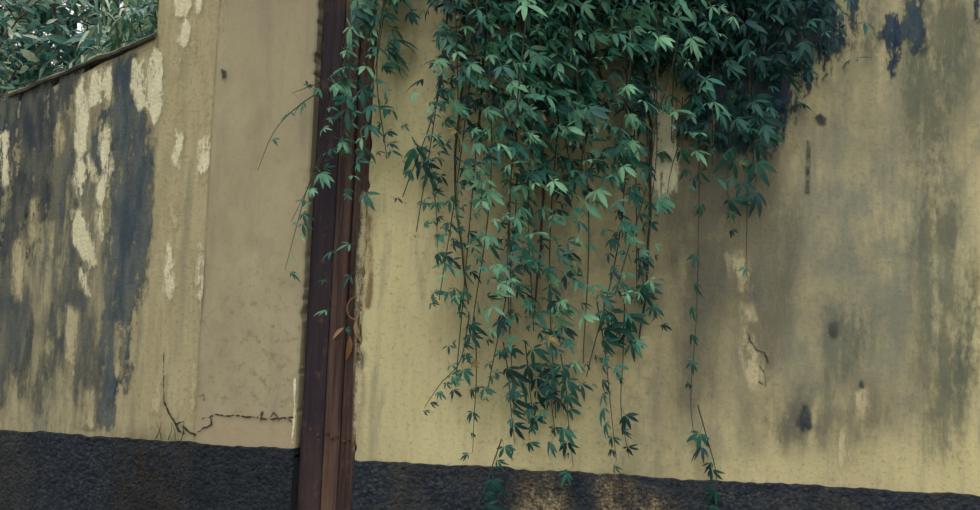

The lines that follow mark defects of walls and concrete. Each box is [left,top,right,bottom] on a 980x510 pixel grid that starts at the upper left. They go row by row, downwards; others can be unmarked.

peeling [0,130,10,188]
peeling [12,198,54,301]
leakage [0,53,155,431]
peeling [55,67,114,297]
peeling [130,48,164,125]
peeling [174,0,203,48]
peeling [643,69,681,201]
leakage [667,0,859,407]
leakage [865,0,979,117]
leakage [919,202,971,449]
crack [163,349,293,436]
leakage [782,390,877,440]